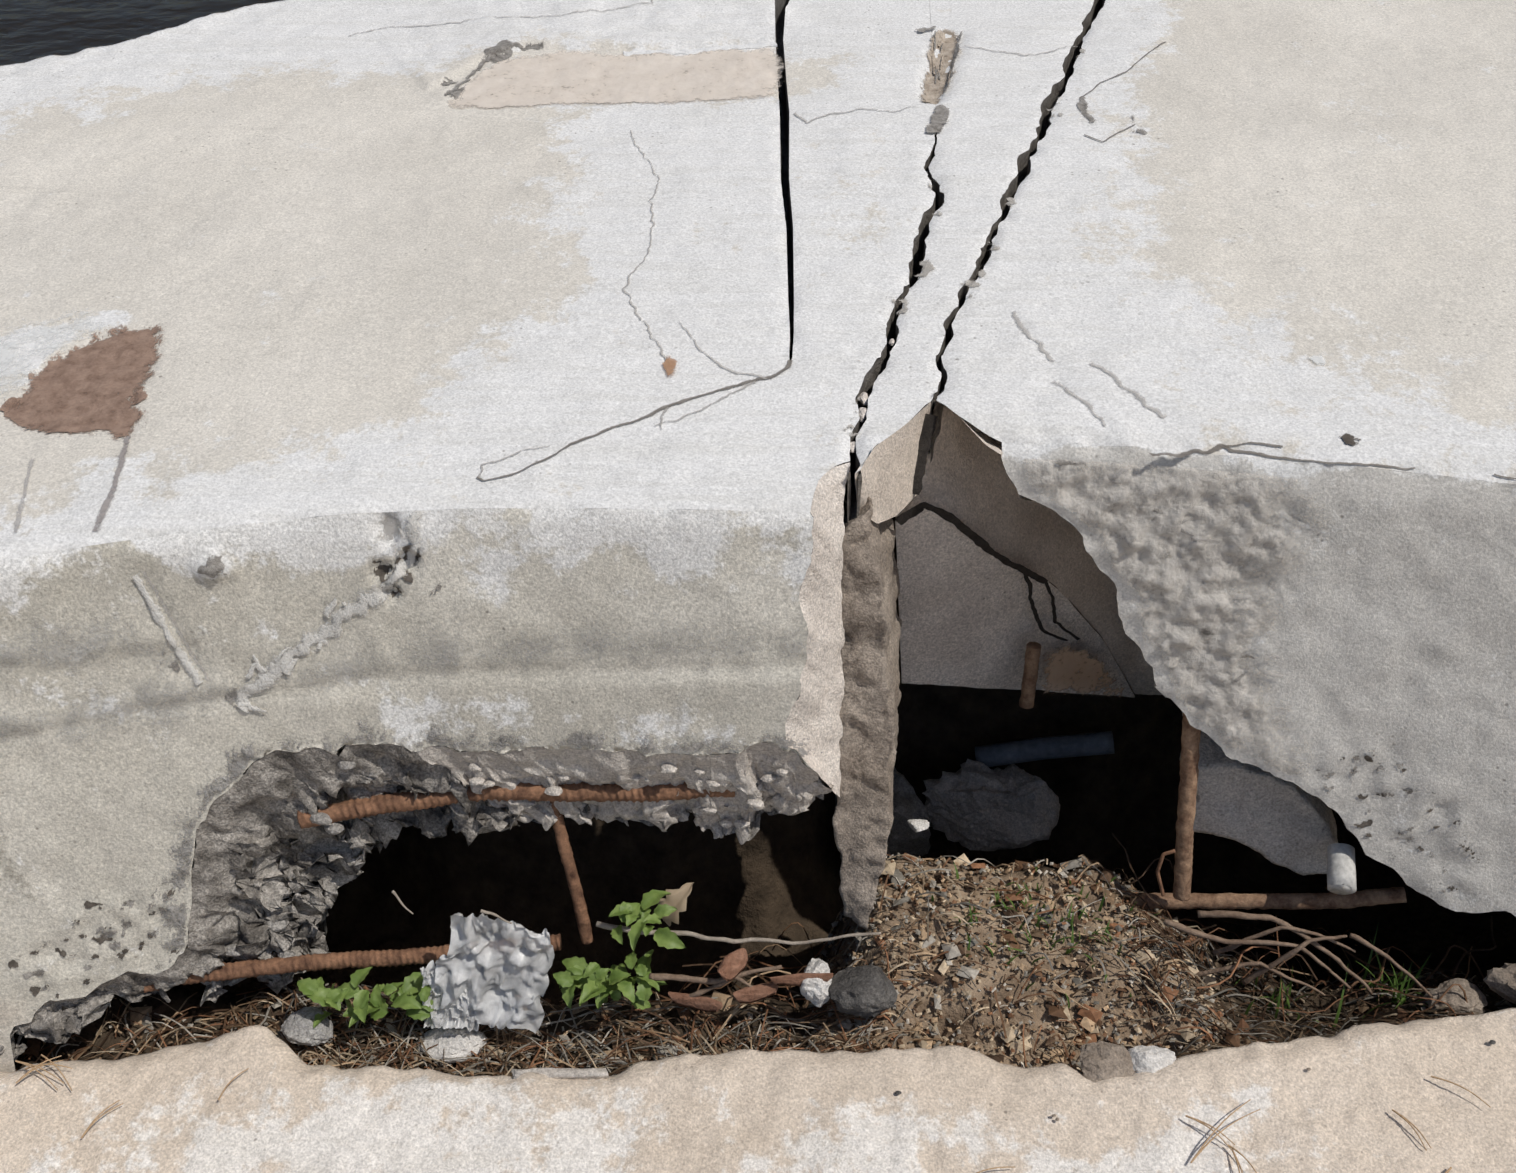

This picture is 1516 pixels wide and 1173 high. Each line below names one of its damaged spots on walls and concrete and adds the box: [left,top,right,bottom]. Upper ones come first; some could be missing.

peeling [441,37,783,109]
spalling [916,26,962,133]
crack [476,0,911,481]
crack [844,0,1166,641]
corrosion [0,325,163,532]
crack [1149,442,1415,470]
corrosion [1042,646,1124,697]
corrosion [182,944,450,985]
spalling [0,719,834,1061]
corrosion [297,781,735,945]
corrosion [550,934,562,952]
corrosion [1130,713,1407,910]